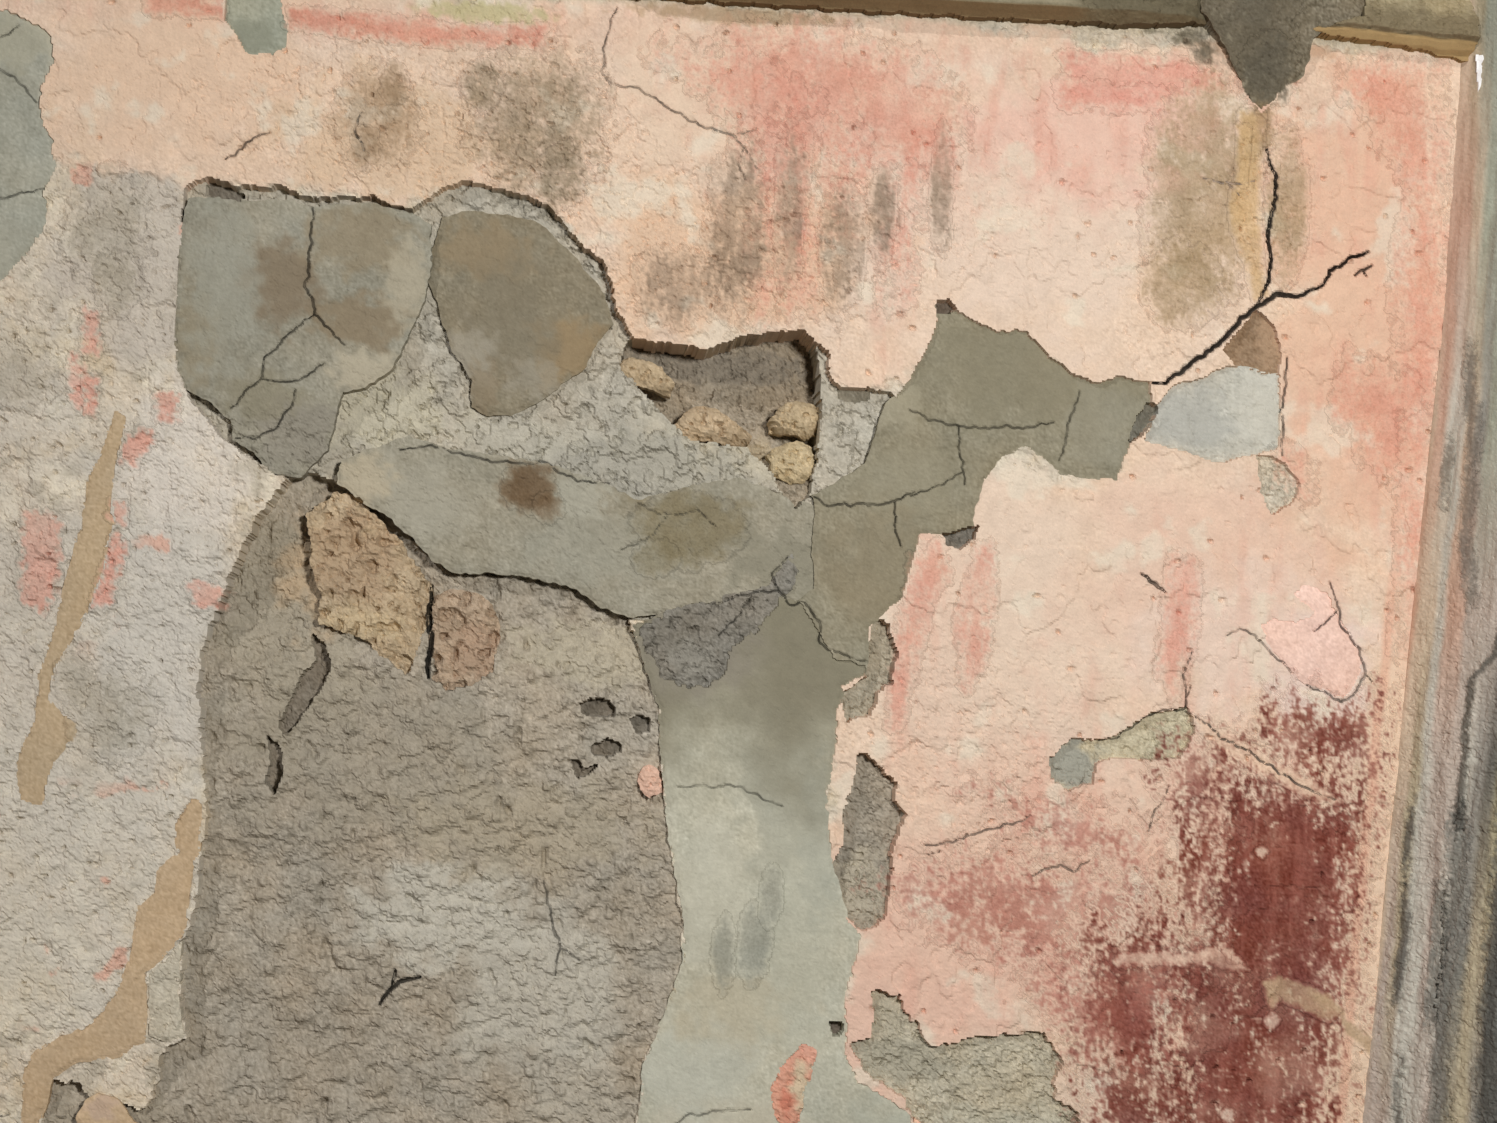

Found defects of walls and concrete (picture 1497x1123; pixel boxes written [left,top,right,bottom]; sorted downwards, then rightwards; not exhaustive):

crack [0,25,36,103]
crack [0,188,44,199]
crack [1152,148,1372,384]
spalling [799,344,891,506]
crack [813,391,1080,546]
peeling [13,504,67,620]
peeling [86,496,132,612]
spalling [115,182,799,1123]
spalling [833,754,904,929]
peeling [850,585,1405,1123]
spalling [44,1079,89,1123]
flaking render [770,1044,817,1123]